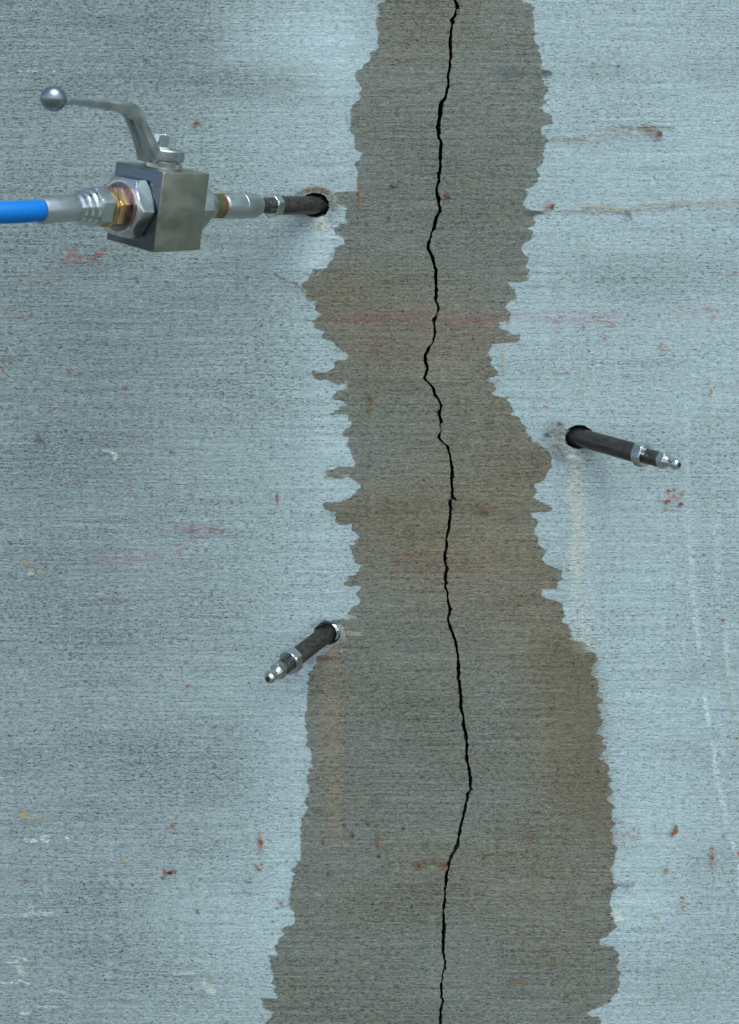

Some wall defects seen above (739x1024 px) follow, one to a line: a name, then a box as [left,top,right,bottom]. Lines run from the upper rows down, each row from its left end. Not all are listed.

water stain [261,0,628,1024]
crack [423,0,473,1024]